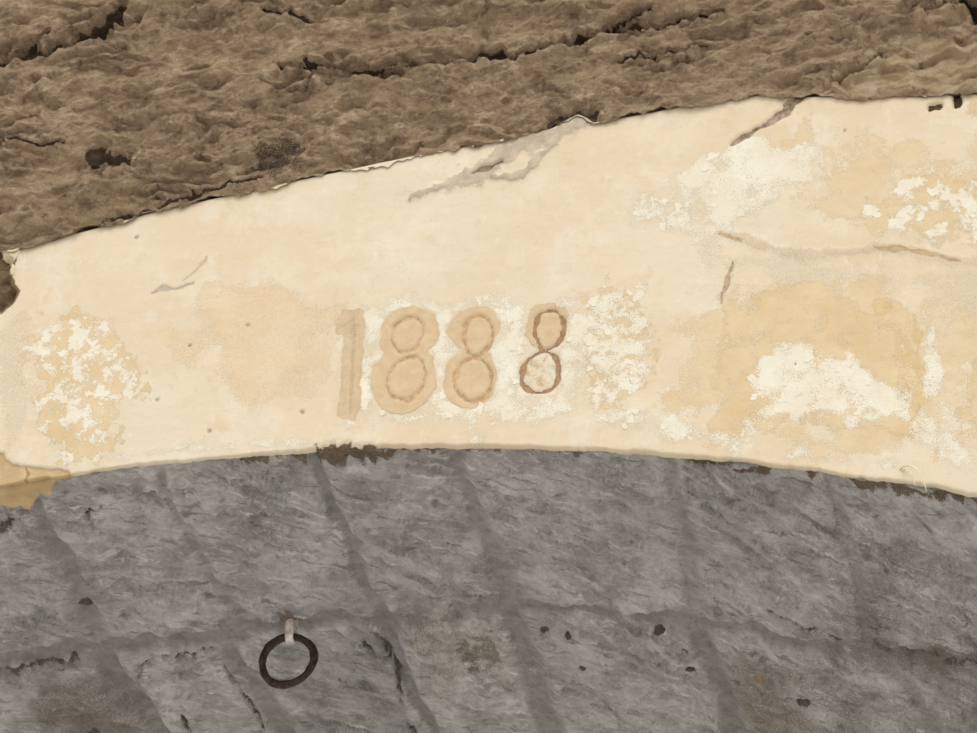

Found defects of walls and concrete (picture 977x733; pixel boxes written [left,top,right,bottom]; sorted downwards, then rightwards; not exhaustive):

crack [959,0,977,26]
peeling [627,131,821,238]
peeling [859,166,977,251]
crack [718,233,742,304]
crack [874,245,961,262]
peeling [0,305,159,509]
peeling [314,273,977,470]